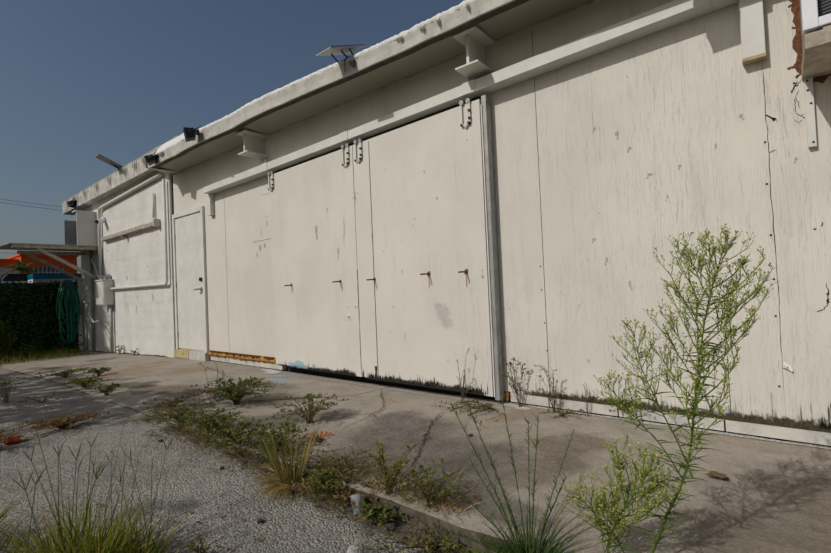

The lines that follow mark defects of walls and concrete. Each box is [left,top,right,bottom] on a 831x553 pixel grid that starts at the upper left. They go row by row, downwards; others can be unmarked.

crack [762,66,805,413]
leakage [279,363,488,396]
crack [399,411,443,488]
leakage [800,402,831,430]